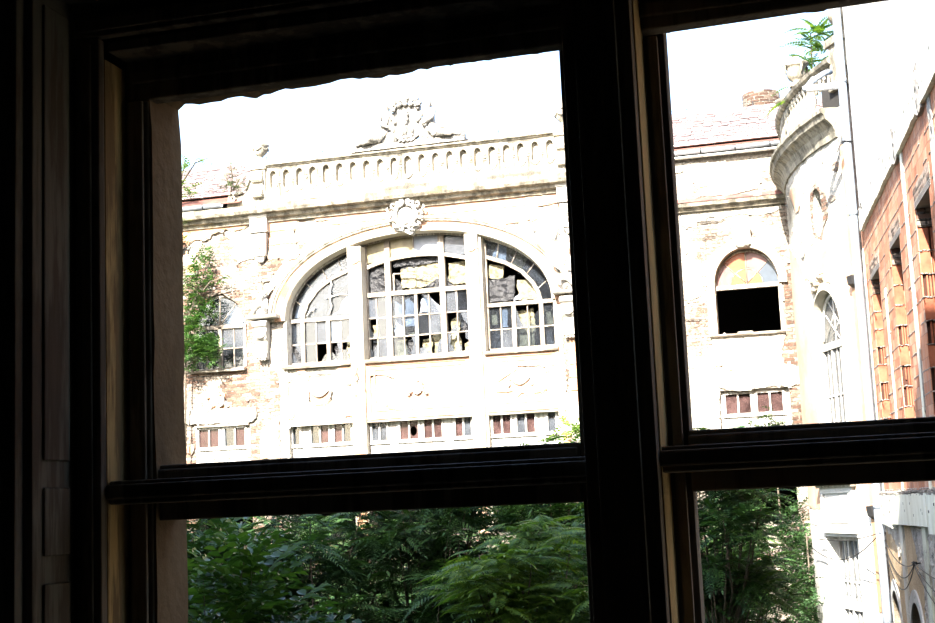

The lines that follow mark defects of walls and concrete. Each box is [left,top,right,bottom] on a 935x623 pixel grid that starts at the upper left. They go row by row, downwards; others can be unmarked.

flaking render [506,203,571,267]
flaking render [675,160,762,197]
flaking render [183,218,353,464]
flaking render [518,323,580,442]
flaking render [678,184,836,430]
spalling [910,526,935,623]